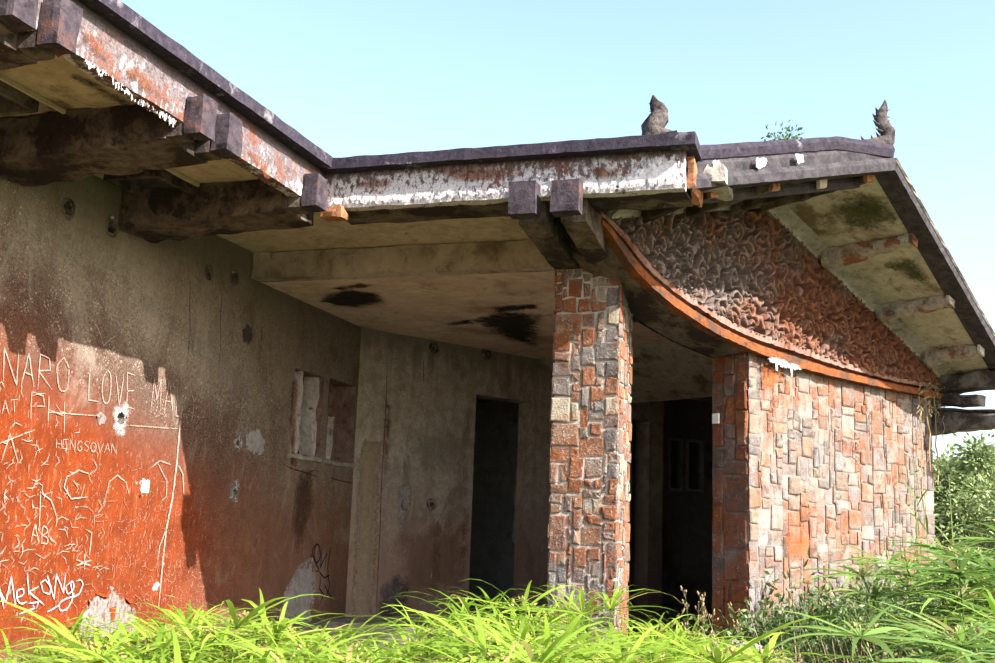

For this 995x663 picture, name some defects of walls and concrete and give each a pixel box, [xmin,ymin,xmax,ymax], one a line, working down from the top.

rust [128,66,150,88]
peeling [522,174,554,192]
peeling [570,154,686,192]
peeling [327,184,509,207]
water stain [321,284,382,307]
water stain [449,305,540,345]
spalling [237,428,265,456]